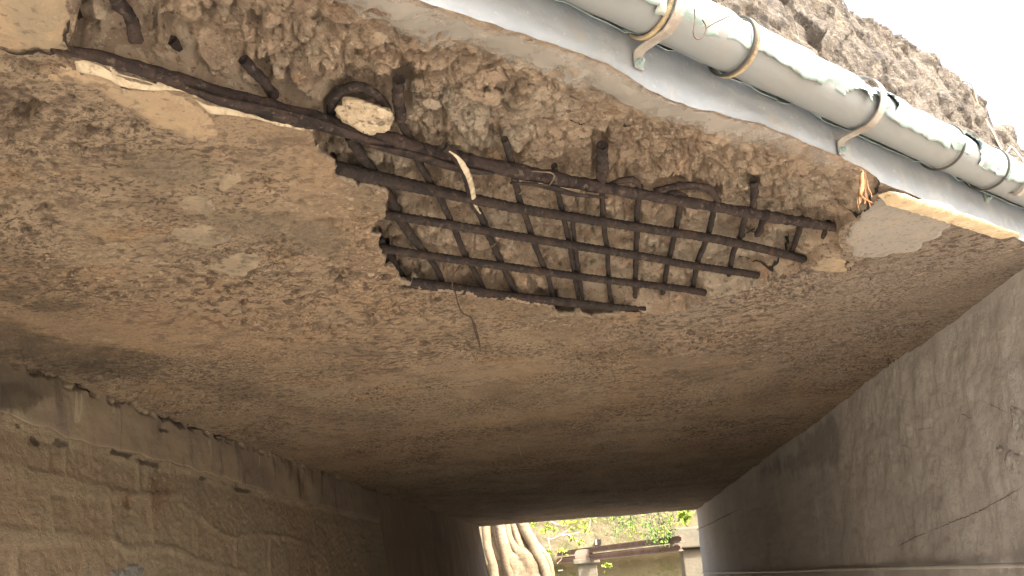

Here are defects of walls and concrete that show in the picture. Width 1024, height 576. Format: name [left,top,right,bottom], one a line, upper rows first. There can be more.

spalling [50,0,1020,318]
crack [901,487,1021,545]